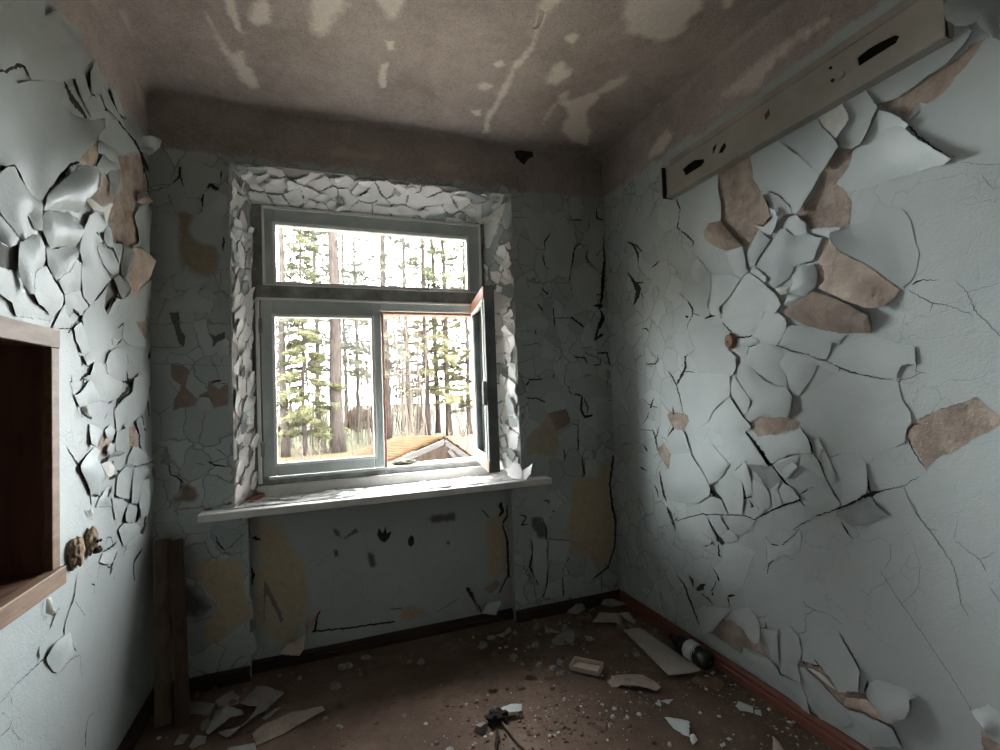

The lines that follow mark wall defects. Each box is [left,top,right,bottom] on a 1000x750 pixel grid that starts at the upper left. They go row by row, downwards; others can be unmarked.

peeling [0,0,533,564]
crack [521,210,659,475]
peeling [657,0,1000,596]
crack [909,279,1000,336]
peeling [46,597,58,615]
peeling [46,632,75,672]
crack [312,608,401,633]
crack [437,479,570,612]
crack [593,455,617,593]
peeling [677,574,918,748]
crack [641,293,1000,724]
peeling [971,704,1000,750]